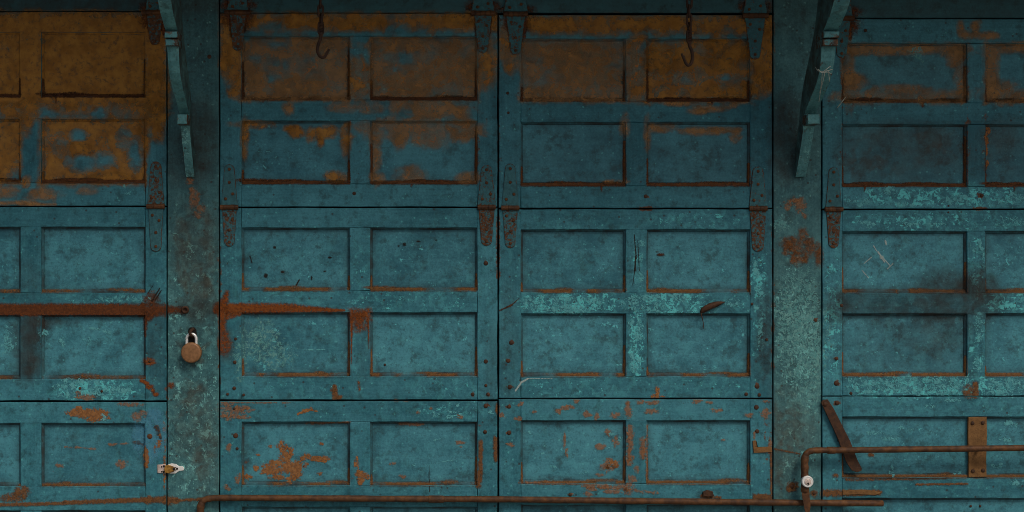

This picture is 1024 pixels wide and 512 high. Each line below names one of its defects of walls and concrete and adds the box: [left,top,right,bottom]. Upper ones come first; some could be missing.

corrosion [36,59,146,103]
corrosion [370,68,478,101]
corrosion [646,69,751,104]
corrosion [842,66,968,107]
corrosion [41,152,147,184]
corrosion [237,160,351,185]
corrosion [370,131,479,187]
corrosion [0,288,184,337]
peeling [518,240,689,374]
peeling [845,312,1024,409]
corrosion [302,468,350,485]
corrosion [536,456,626,485]